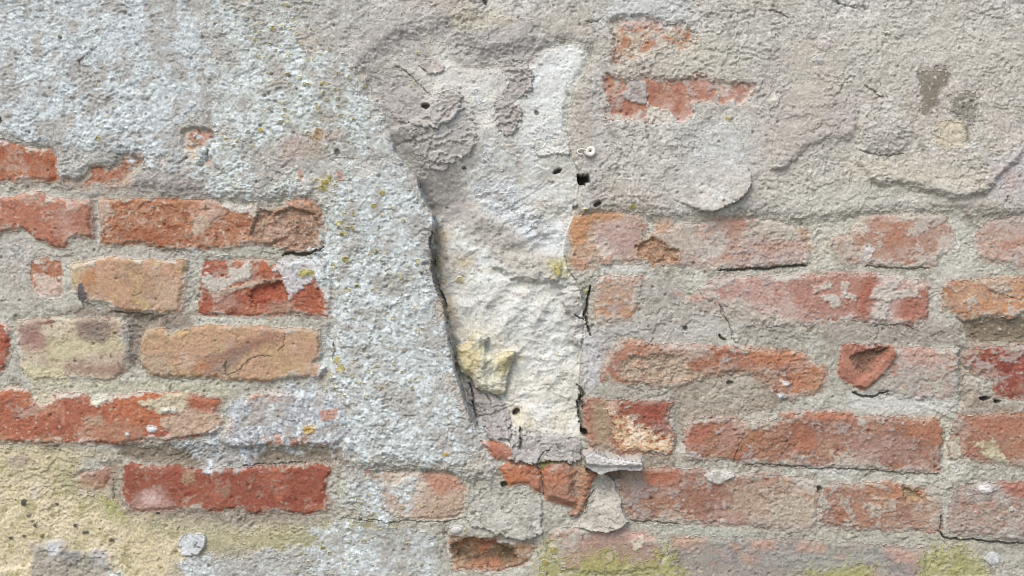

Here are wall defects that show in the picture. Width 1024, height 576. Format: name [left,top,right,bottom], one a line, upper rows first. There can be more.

spalling [251,208,324,252]
spalling [635,238,681,266]
spalling [251,282,287,306]
crack [429,232,449,318]
crack [575,287,591,335]
spalling [623,354,703,386]
spalling [852,348,890,374]
crack [577,386,586,429]
spalling [0,444,292,576]
peeling [452,480,543,567]
peeling [579,473,629,533]